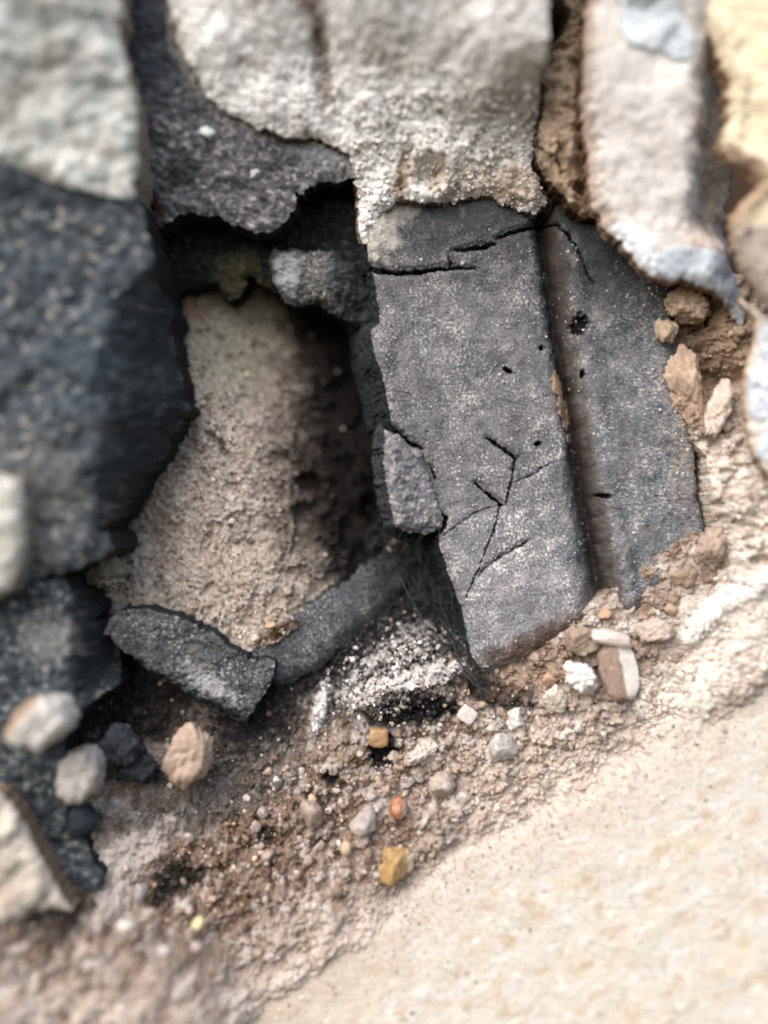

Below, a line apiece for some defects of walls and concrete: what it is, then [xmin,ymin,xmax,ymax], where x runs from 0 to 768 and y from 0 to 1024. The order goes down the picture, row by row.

crack [371,205,592,282]
spalling [104,286,443,652]
crack [402,433,436,480]
crack [439,513,449,534]
crack [471,437,527,584]